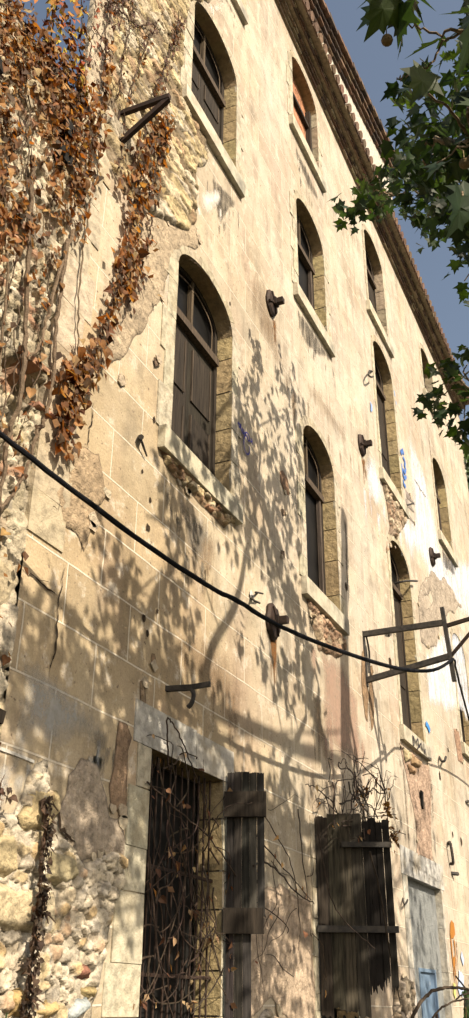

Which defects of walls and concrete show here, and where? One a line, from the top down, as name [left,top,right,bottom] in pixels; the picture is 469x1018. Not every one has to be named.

flaking render [98,0,221,373]
flaking render [57,446,111,550]
flaking render [280,470,291,495]
flaking render [382,483,416,553]
crack [28,569,65,674]
flaking render [307,599,347,659]
flaking render [418,571,462,649]
flaking render [399,743,441,861]
flaking render [0,721,132,1018]
flaking render [251,883,315,1018]
flaking render [393,973,416,1018]